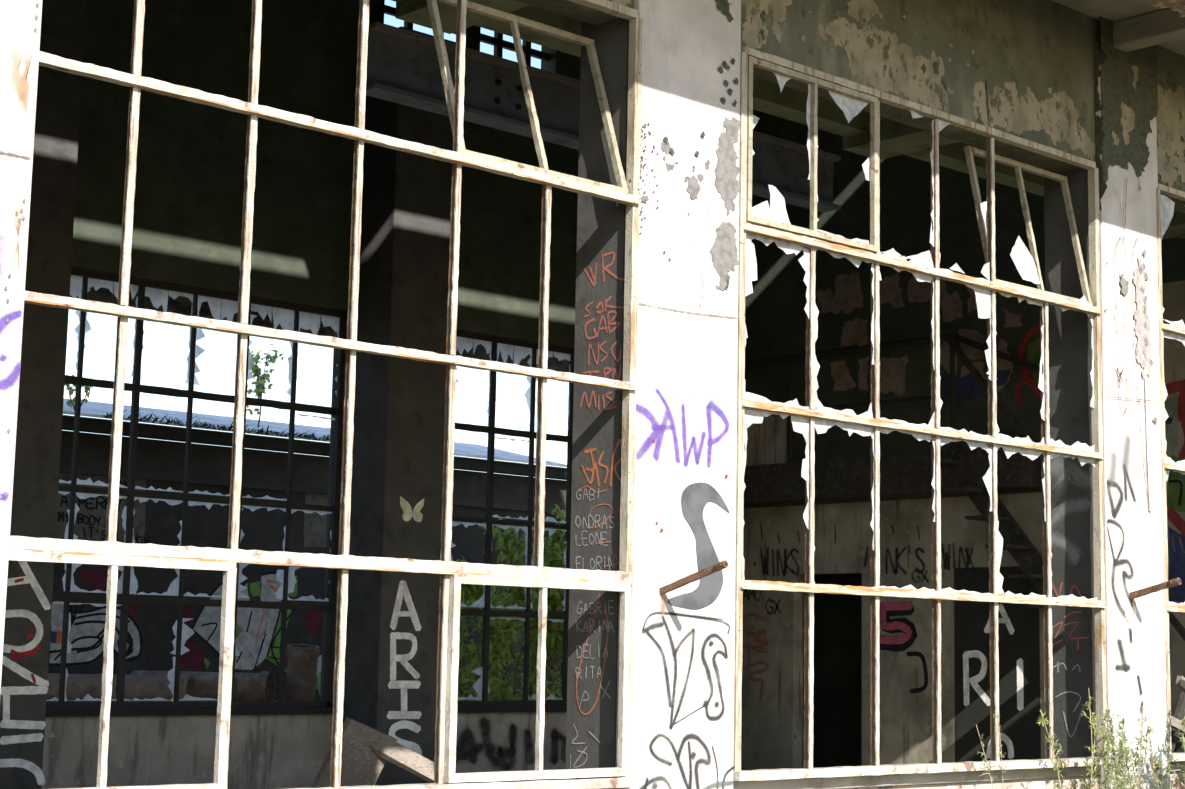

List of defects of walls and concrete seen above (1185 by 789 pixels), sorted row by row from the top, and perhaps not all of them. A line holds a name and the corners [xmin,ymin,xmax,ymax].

peeling [638,58,740,291]
peeling [716,0,1185,211]